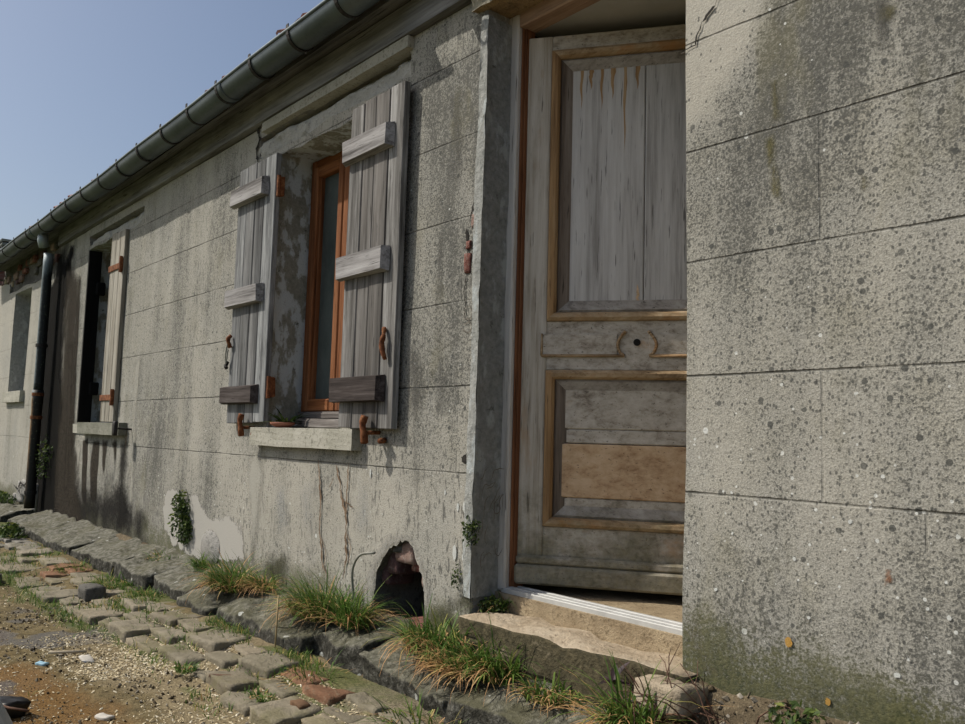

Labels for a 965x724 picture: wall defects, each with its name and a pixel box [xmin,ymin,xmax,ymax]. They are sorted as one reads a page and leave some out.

leakage [35,246,142,539]
peeling [162,455,263,563]
spalling [351,535,430,634]